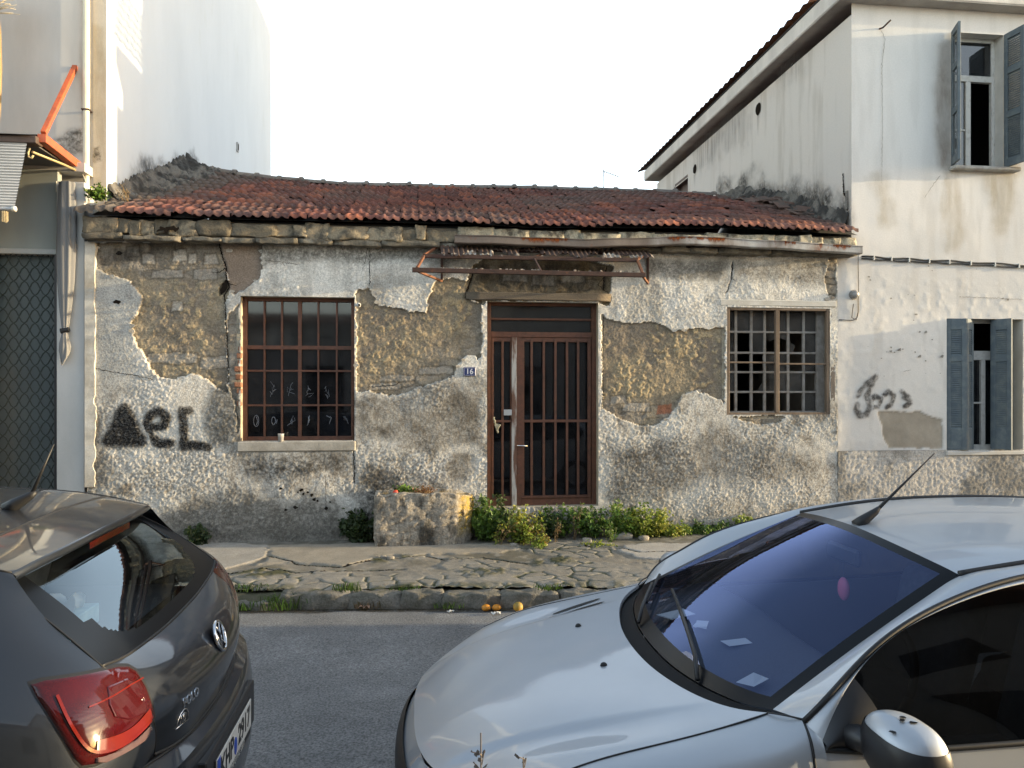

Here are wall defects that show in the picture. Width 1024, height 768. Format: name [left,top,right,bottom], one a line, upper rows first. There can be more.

flaking render [97,242,263,433]
crack [212,244,238,380]
flaking render [353,256,727,425]